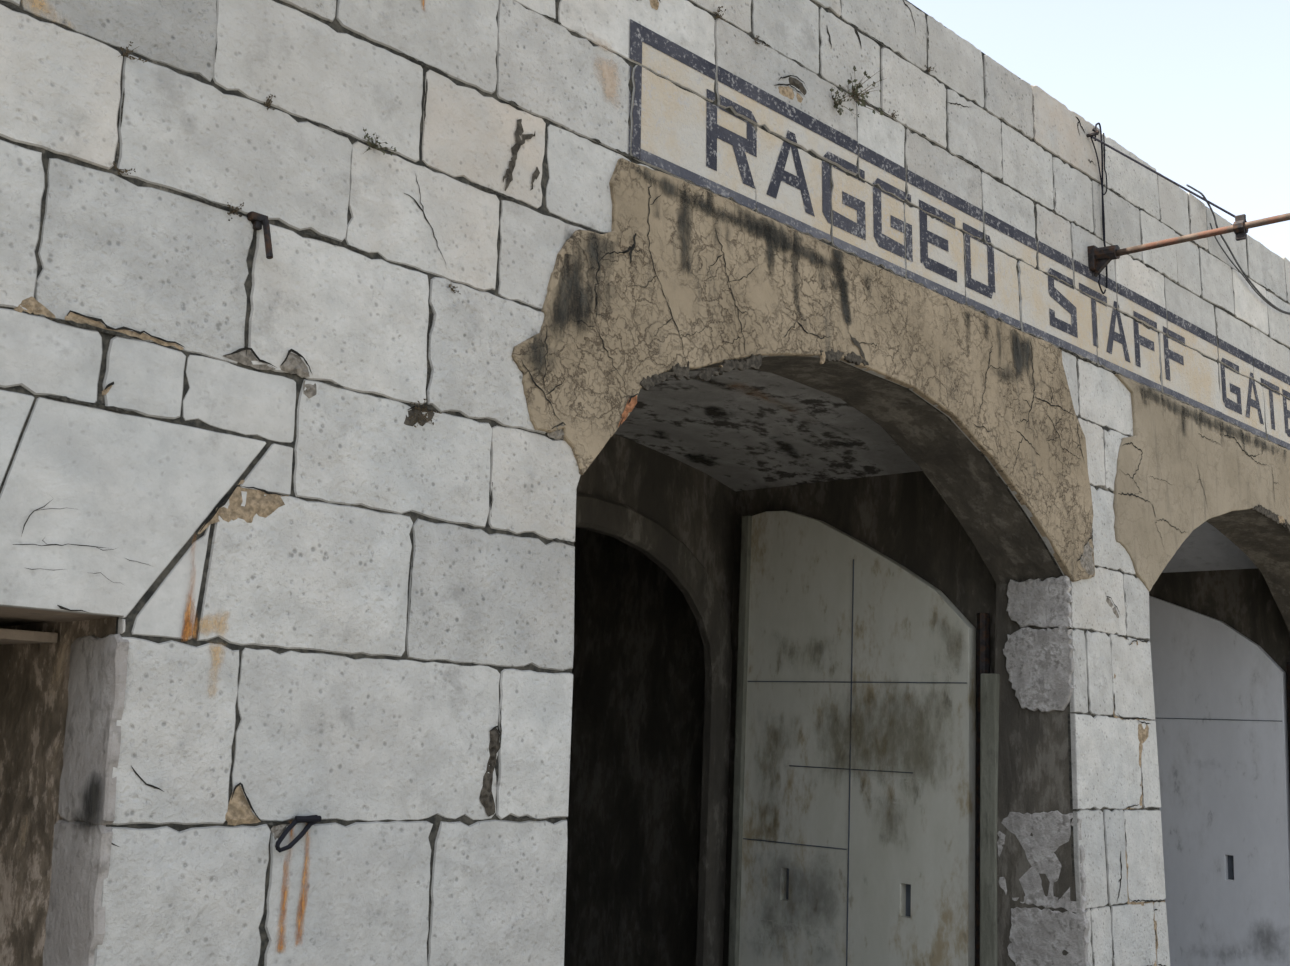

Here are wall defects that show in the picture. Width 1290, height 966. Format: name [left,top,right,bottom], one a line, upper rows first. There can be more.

crack [503,119,540,191]
leakage [644,172,851,324]
crack [521,179,755,420]
flaking render [618,354,763,428]
crack [785,322,876,361]
flaking render [820,349,869,366]
peeling [684,454,714,466]
spalling [198,480,289,534]
corrosion [182,588,225,640]
corrosion [278,854,309,951]